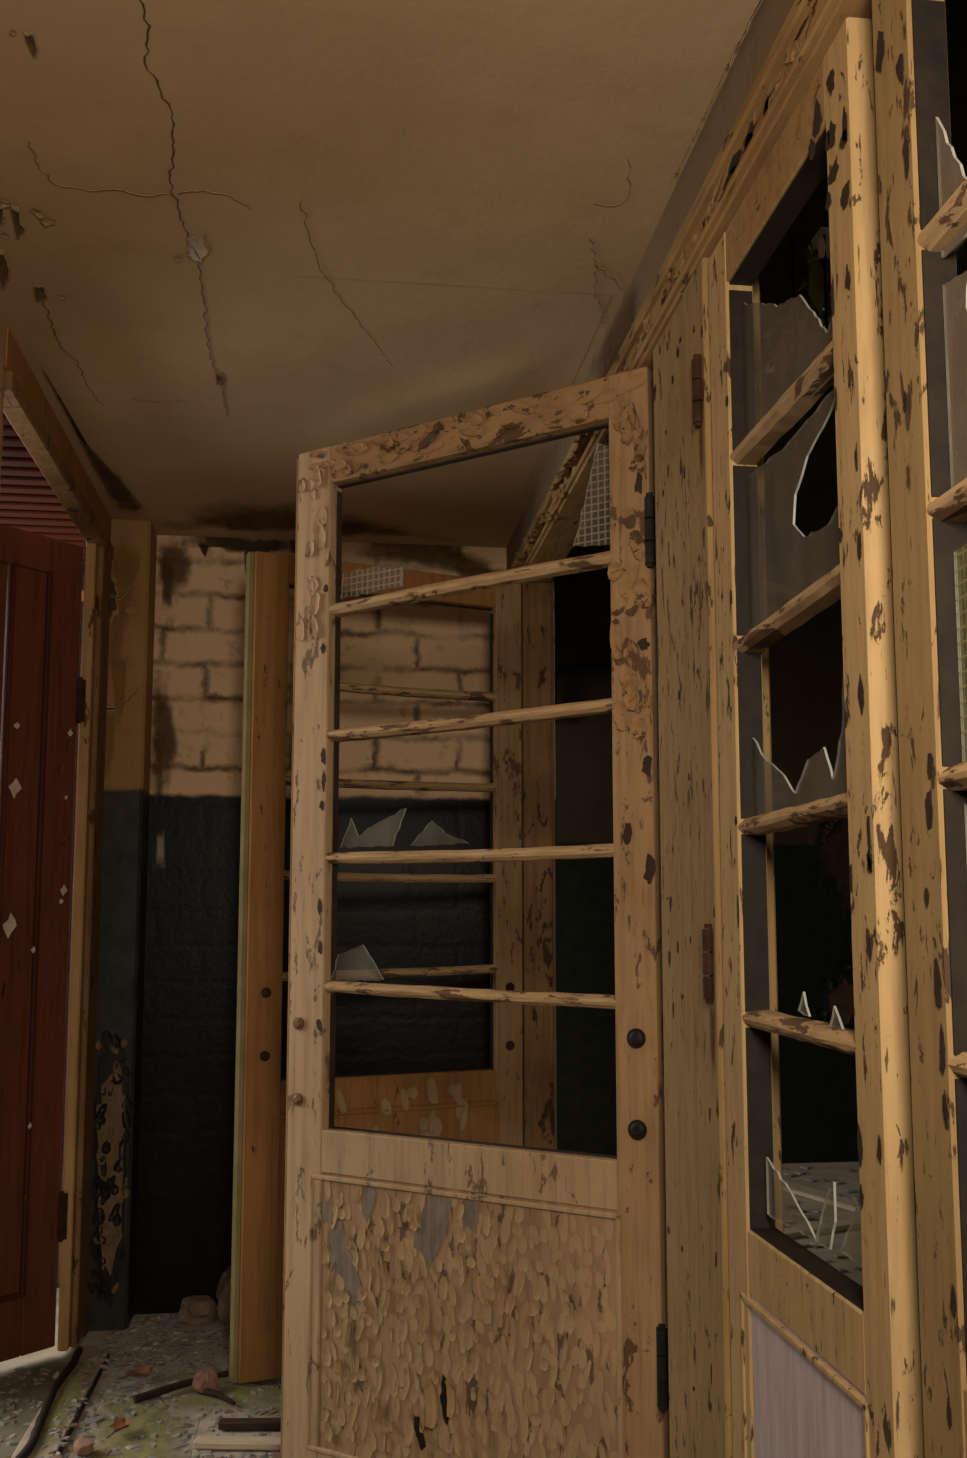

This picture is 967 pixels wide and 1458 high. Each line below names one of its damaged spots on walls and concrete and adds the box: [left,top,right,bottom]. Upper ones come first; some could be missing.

peeling [875,31,904,85]
crack [28,0,251,417]
crack [299,202,388,361]
peeling [808,68,850,211]
peeling [902,137,910,179]
peeling [838,528,861,561]
peeling [844,673,864,728]
peeling [925,753,934,830]
peeling [934,958,949,1128]
peeling [88,1030,132,1309]
peeling [320,1179,618,1458]
peeling [751,1296,867,1458]